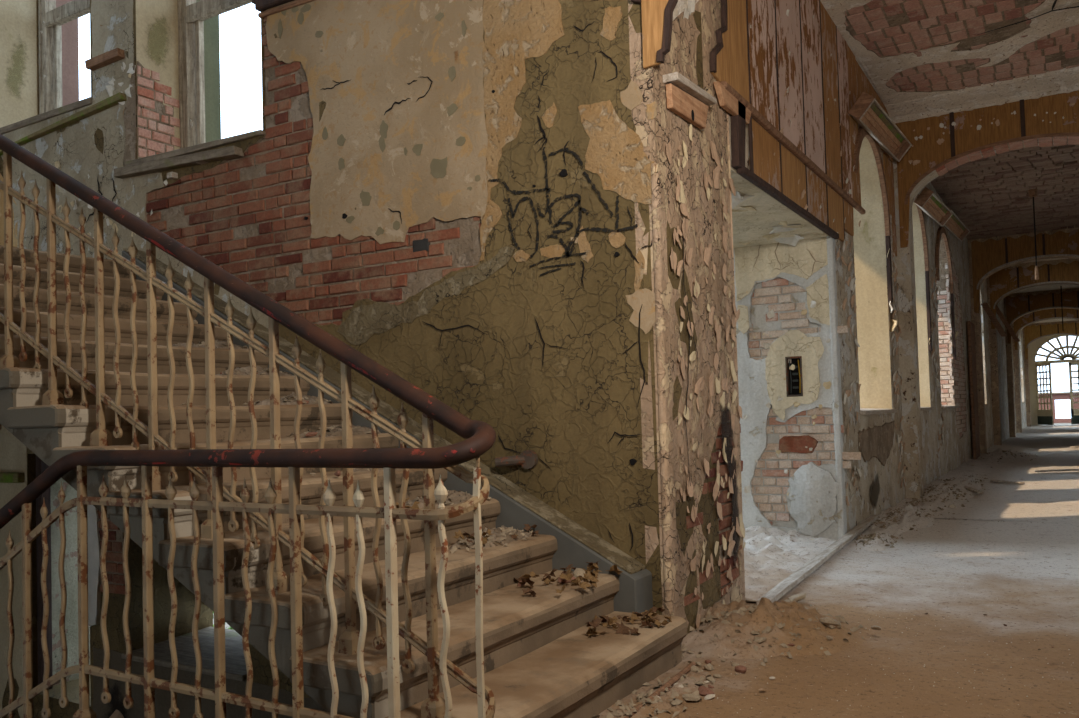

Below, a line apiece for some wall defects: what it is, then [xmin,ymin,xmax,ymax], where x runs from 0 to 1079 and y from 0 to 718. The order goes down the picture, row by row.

peeling [600,6,622,41]
flaking render [832,0,1079,92]
crack [384,77,433,115]
peeling [1,0,594,345]
peeling [578,80,657,205]
peeling [608,231,626,257]
peeling [625,248,656,334]
crack [534,317,567,366]
crack [622,306,645,407]
peeling [666,124,907,628]
crack [608,431,641,446]